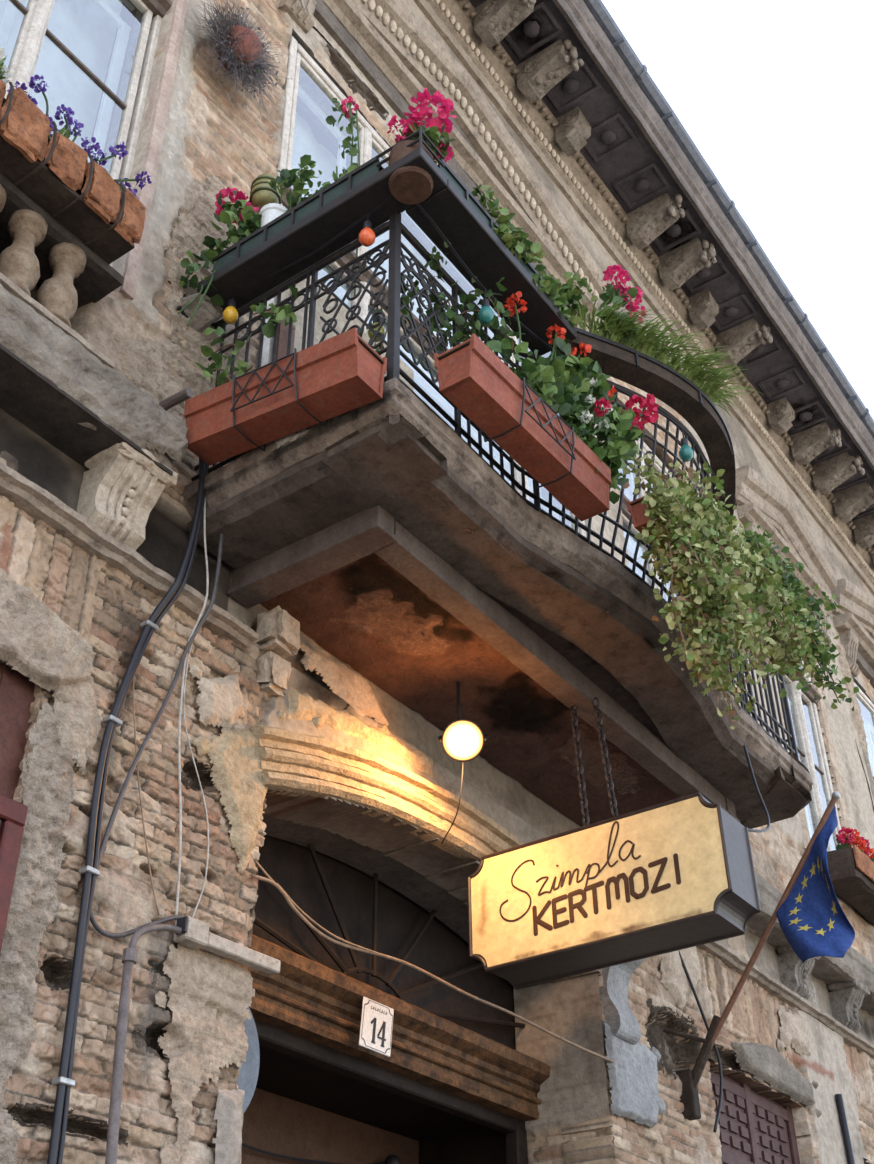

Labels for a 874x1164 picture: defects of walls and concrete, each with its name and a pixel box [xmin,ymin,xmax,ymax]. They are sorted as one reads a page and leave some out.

water stain [339,555,471,641]
water stain [304,675,344,706]
water stain [485,673,569,735]
flaking render [181,665,268,874]
peeling [728,935,750,961]
spalling [131,991,170,1061]
peeling [604,946,833,1128]
peeling [203,1062,221,1083]